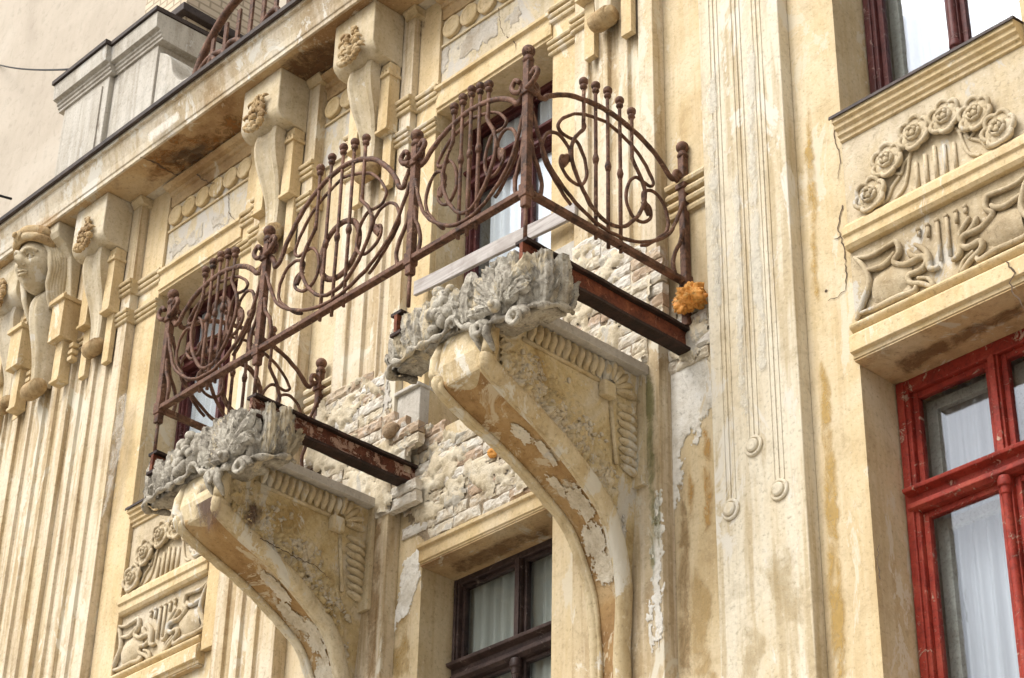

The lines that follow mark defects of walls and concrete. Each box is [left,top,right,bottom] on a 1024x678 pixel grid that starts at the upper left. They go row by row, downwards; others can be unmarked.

damp [149,113,242,181]
damp [805,135,813,168]
crack [828,205,847,301]
damp [899,307,1022,372]
spalling [304,371,531,632]
peeling [510,424,613,586]
spalling [562,236,712,653]
damp [821,372,830,424]
damp [825,446,838,539]
peeling [258,570,333,678]
damp [828,553,844,676]